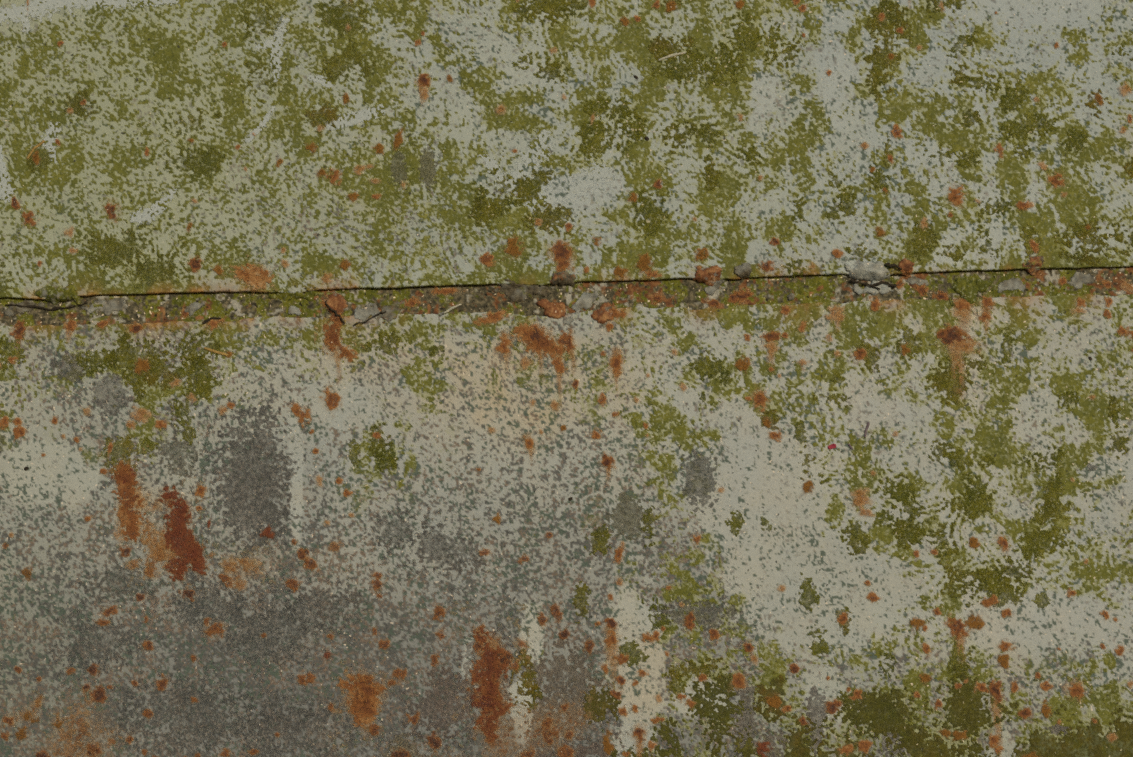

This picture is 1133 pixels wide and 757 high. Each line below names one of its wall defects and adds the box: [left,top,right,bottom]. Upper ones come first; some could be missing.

crack [5,301,87,311]
crack [325,300,386,326]
rust [474,311,579,389]
rust [614,253,662,278]
crack [850,262,902,290]
rust [896,267,995,379]
rust [100,442,262,601]
rust [337,669,407,735]
rust [467,625,588,757]